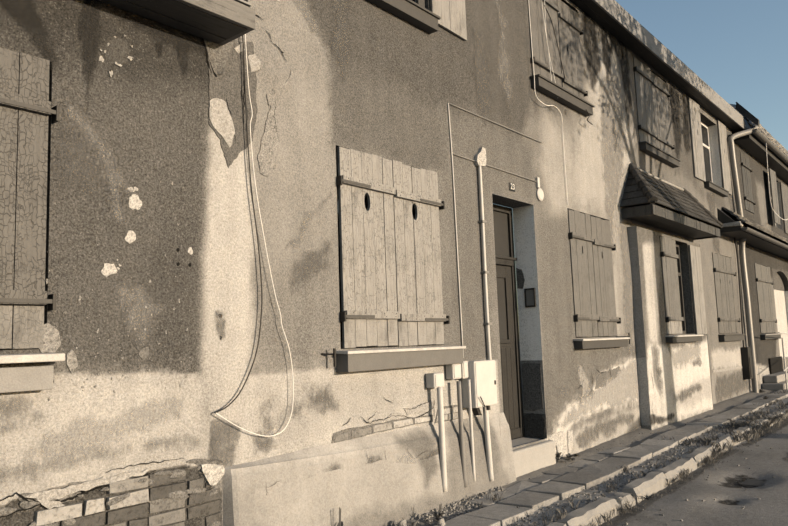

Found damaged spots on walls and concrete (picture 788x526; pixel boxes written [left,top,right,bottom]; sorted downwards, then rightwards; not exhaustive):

flaking render [204,39,279,177]
leakage [669,86,690,157]
leakage [564,11,640,427]
leakage [653,347,663,393]
flaking render [331,401,458,443]
leakage [577,413,674,447]
flaking render [0,458,225,526]